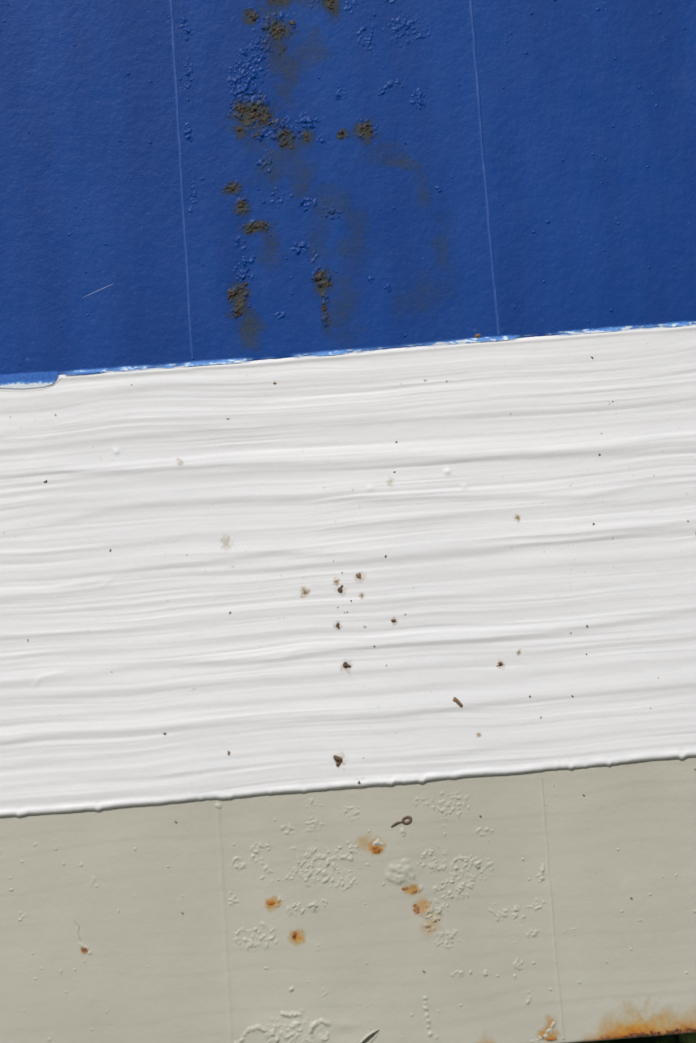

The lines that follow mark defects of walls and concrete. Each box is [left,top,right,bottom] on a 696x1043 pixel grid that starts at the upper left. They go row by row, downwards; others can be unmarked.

corrosion [323,0,338,14]
corrosion [234,102,310,149]
corrosion [338,123,372,139]
corrosion [226,183,269,234]
corrosion [227,282,249,317]
corrosion [315,271,332,312]
corrosion [369,840,383,854]
corrosion [401,886,426,914]
corrosion [539,1022,557,1041]
corrosion [599,1016,696,1040]